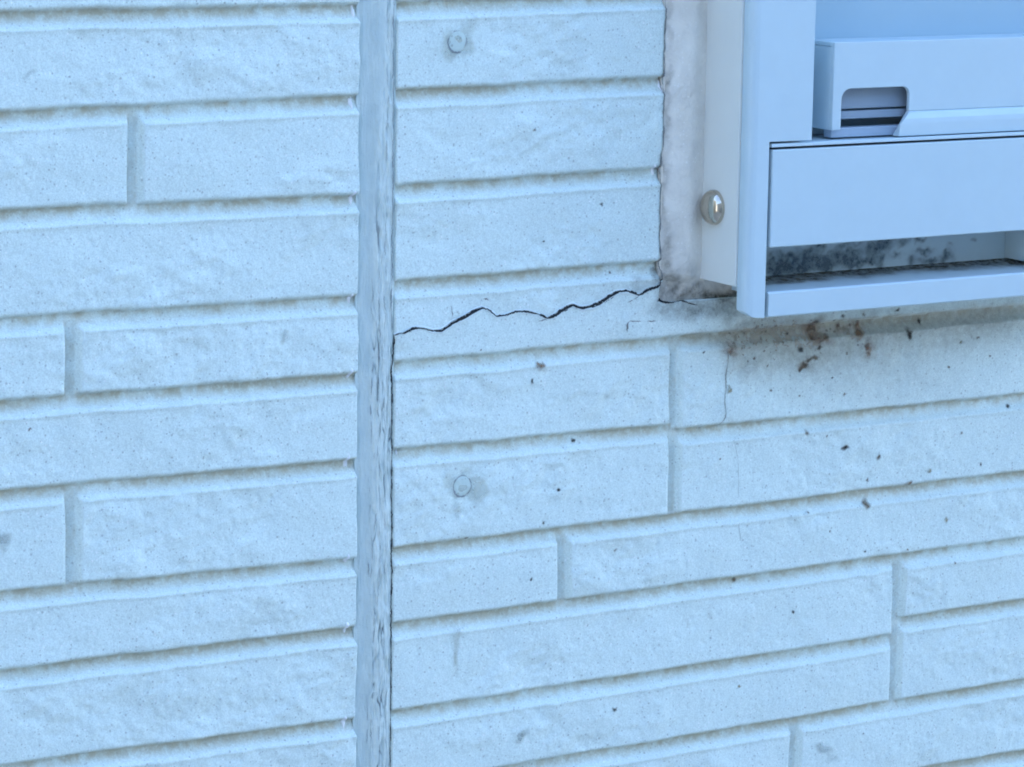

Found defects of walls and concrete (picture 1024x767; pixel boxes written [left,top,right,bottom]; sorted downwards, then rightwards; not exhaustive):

crack [367,0,697,764]